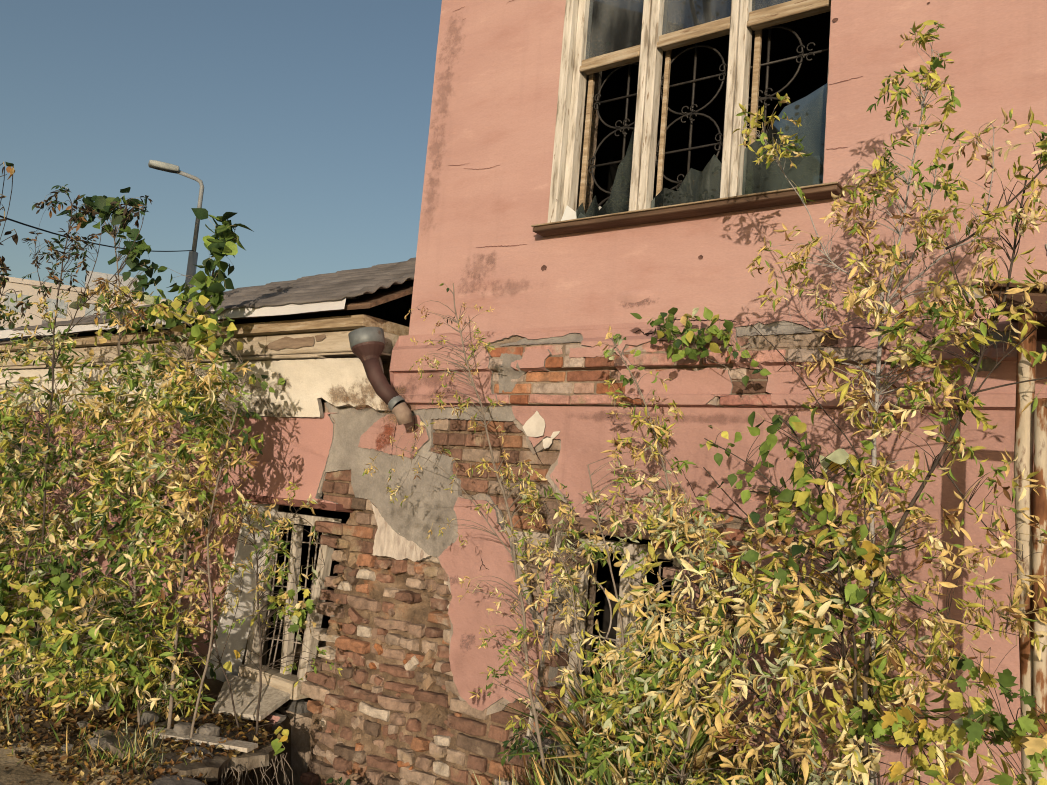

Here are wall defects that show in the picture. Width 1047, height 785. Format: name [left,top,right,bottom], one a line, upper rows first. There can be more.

flaking render [300,321,910,785]